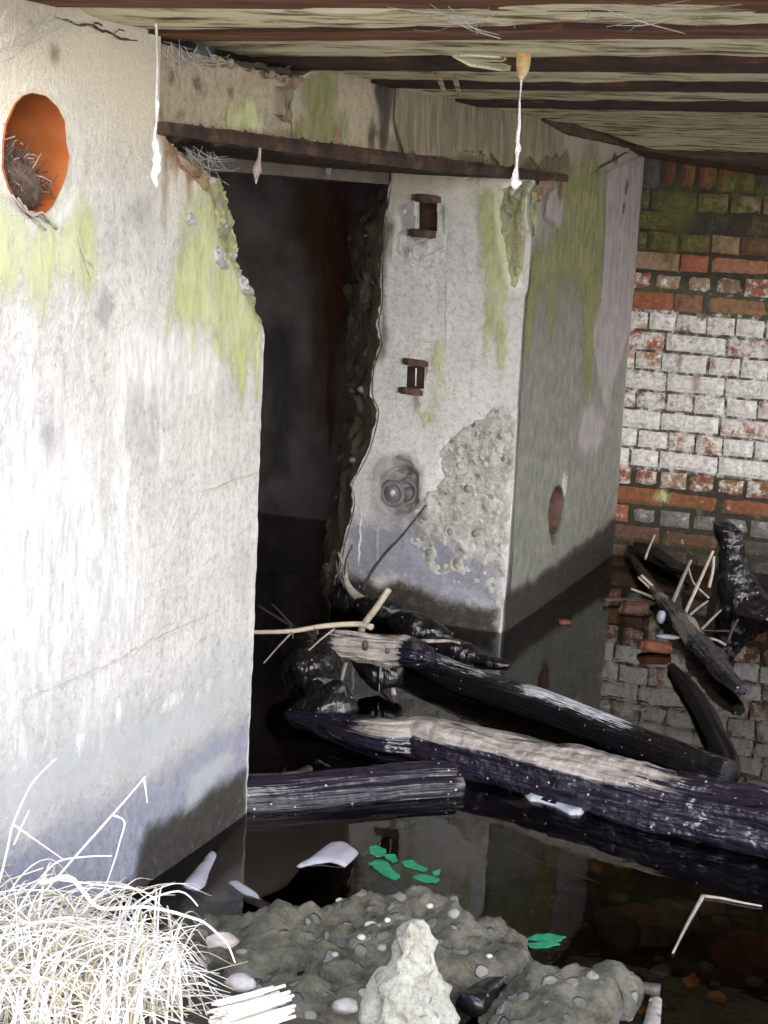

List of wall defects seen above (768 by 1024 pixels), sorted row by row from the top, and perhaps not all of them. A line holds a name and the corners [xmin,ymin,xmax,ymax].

crack [56,17,138,41]
spalling [168,143,262,324]
spalling [320,173,447,606]
damp [511,154,570,173]
damp [525,277,556,356]
damp [545,188,564,228]
spalling [394,406,516,604]
damp [335,456,616,633]